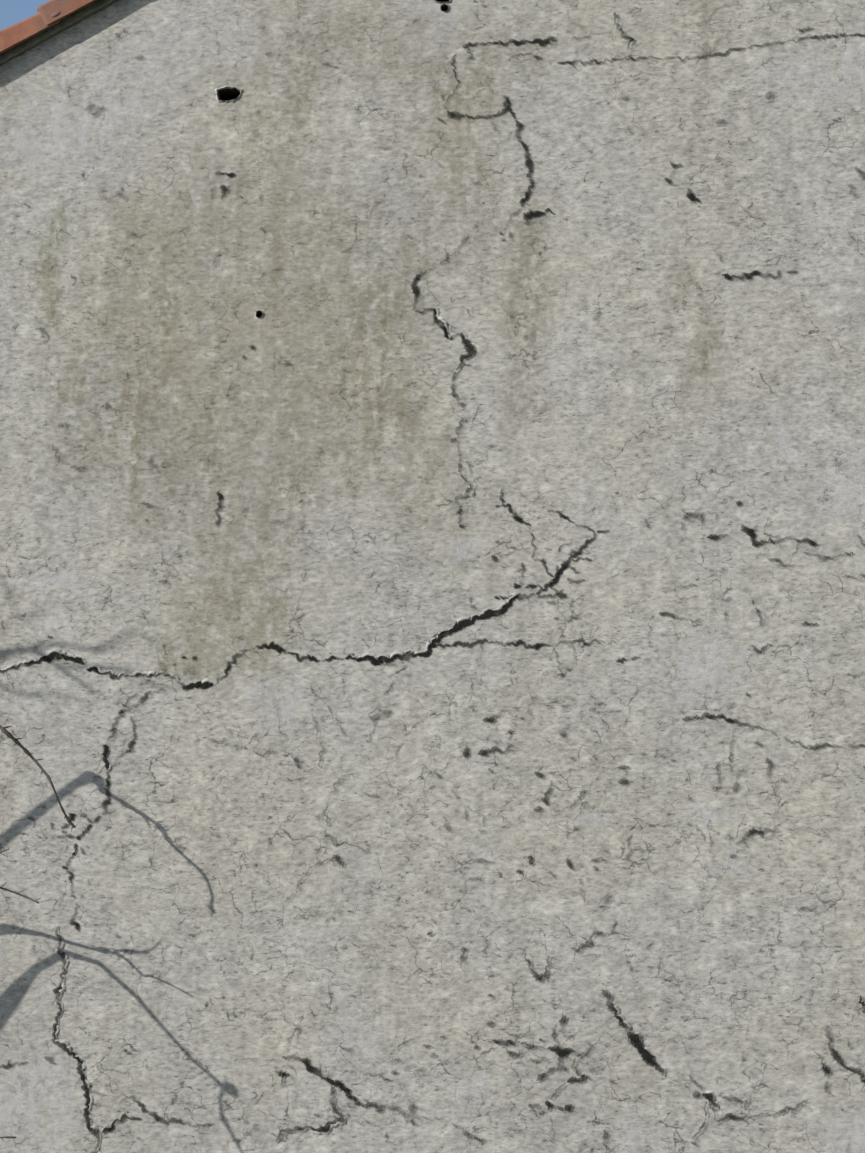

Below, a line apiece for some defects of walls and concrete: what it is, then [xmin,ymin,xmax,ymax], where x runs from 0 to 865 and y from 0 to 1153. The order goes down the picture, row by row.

crack [798,33,865,41]
crack [437,13,764,225]
crack [722,270,798,280]
crack [411,259,477,398]
crack [683,500,865,562]
crack [0,490,609,701]
crack [68,735,136,882]
crack [52,919,183,1153]
crack [276,1056,415,1144]
crack [601,988,667,1076]
crack [691,1091,745,1144]
crack [820,1038,865,1083]